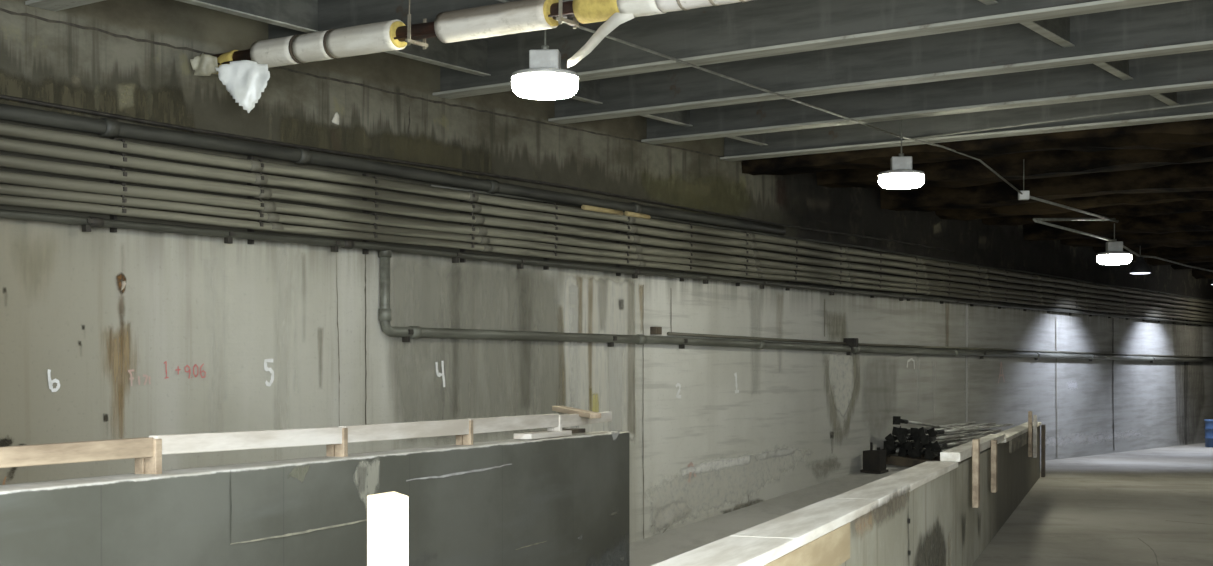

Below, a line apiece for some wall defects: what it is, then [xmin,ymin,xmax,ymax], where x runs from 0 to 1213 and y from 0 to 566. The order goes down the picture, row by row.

leakage [0,70,194,133]
rust [117,273,126,293]
leakage [355,460,379,508]
leakage [916,521,979,566]